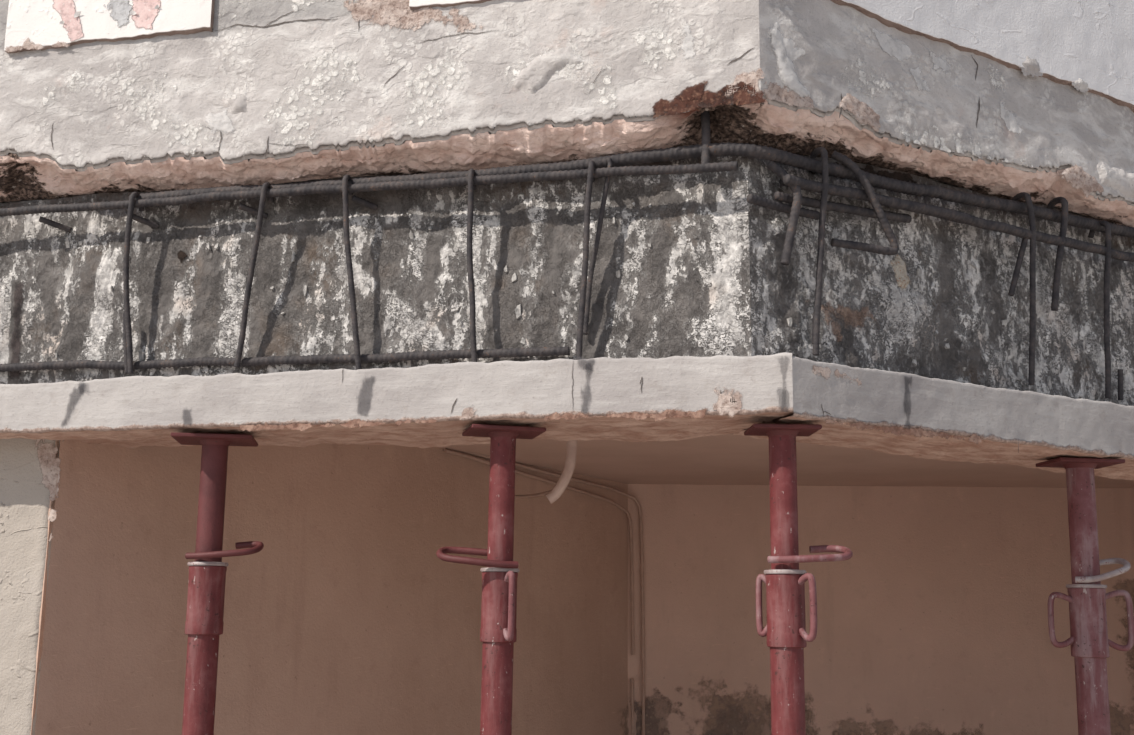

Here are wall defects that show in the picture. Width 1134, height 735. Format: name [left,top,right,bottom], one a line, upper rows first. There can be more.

peeling [6,0,83,52]
peeling [104,0,160,29]
rust [652,81,766,119]
spalling [0,68,1134,406]
spalling [239,419,436,431]
spalling [460,407,475,420]
spalling [544,389,742,421]
water stain [1116,580,1134,669]
water stain [623,688,681,735]
water stain [696,681,771,735]
water stain [833,710,982,735]
water stain [1109,705,1134,735]